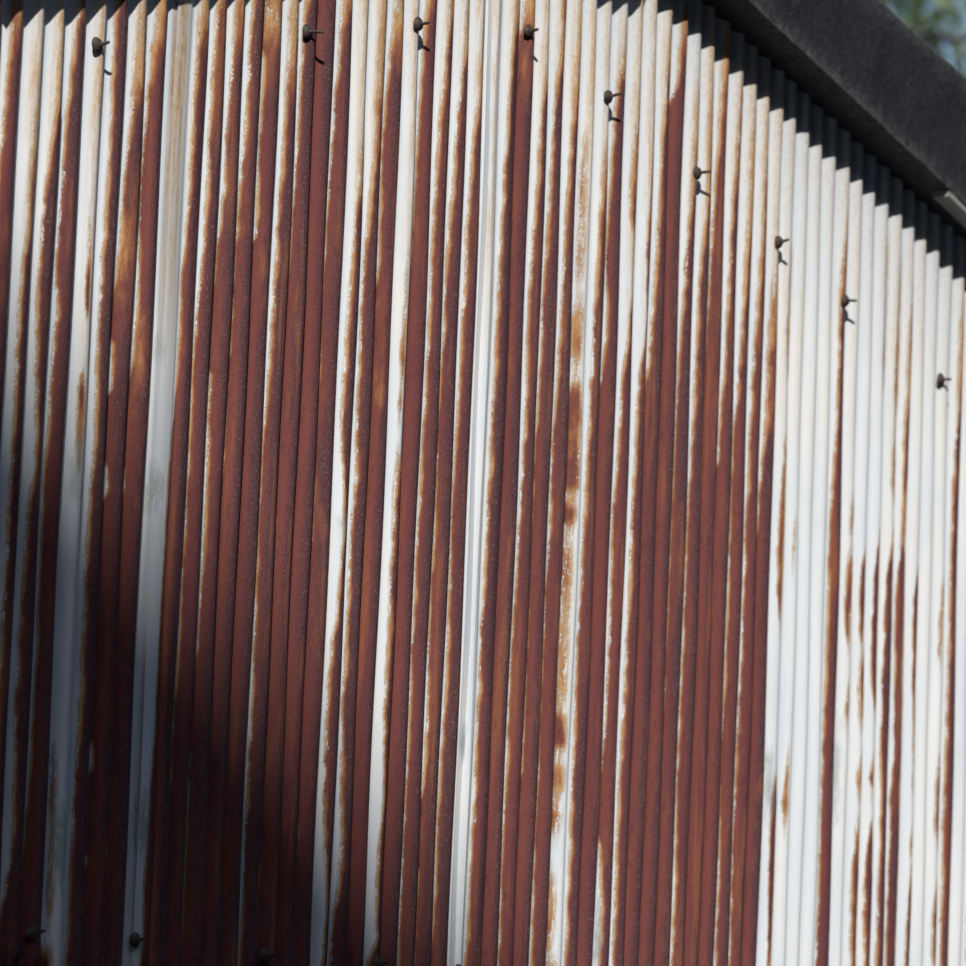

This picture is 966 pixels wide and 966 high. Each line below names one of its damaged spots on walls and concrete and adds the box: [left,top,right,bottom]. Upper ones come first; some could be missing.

rust [0,0,168,966]
rust [140,0,485,966]
rust [463,0,796,966]
rust [816,213,919,966]
rust [931,291,965,966]